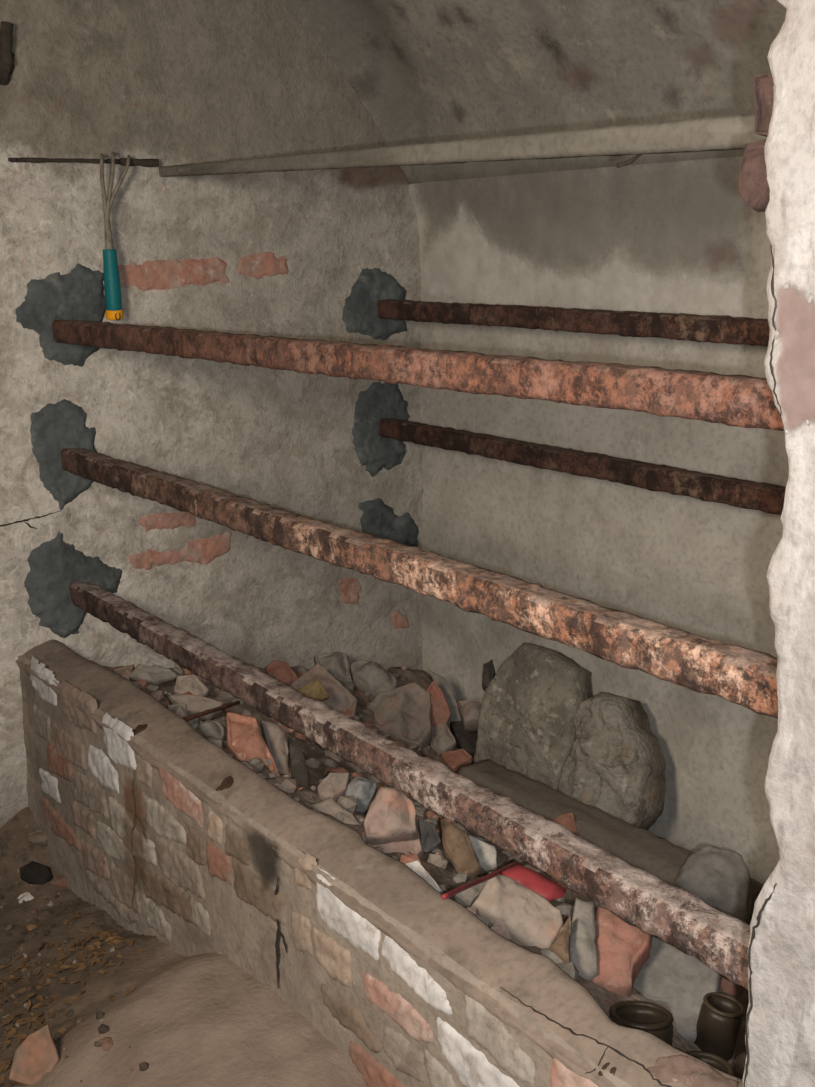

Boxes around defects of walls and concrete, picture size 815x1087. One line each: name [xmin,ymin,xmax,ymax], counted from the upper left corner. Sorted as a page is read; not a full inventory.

rust [51,319,784,431]
rust [377,299,770,347]
crack [0,511,59,529]
rust [380,418,786,515]
rust [61,448,778,718]
rust [69,582,750,990]
crack [275,877,287,989]